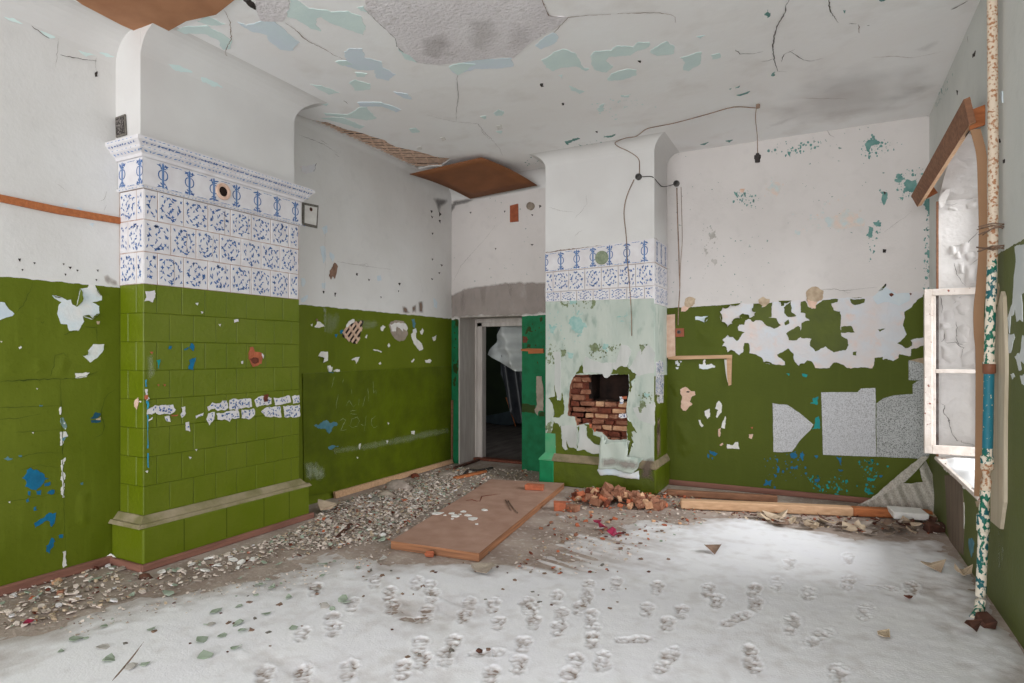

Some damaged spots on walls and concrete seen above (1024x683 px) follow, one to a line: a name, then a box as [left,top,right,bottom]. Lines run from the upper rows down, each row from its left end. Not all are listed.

flaking render [238,0,721,94]
crack [737,1,822,72]
peeling [310,48,449,166]
peeling [861,134,902,159]
peeling [52,285,102,331]
peeling [680,189,950,495]
peeling [134,380,300,473]
peeling [522,300,682,479]